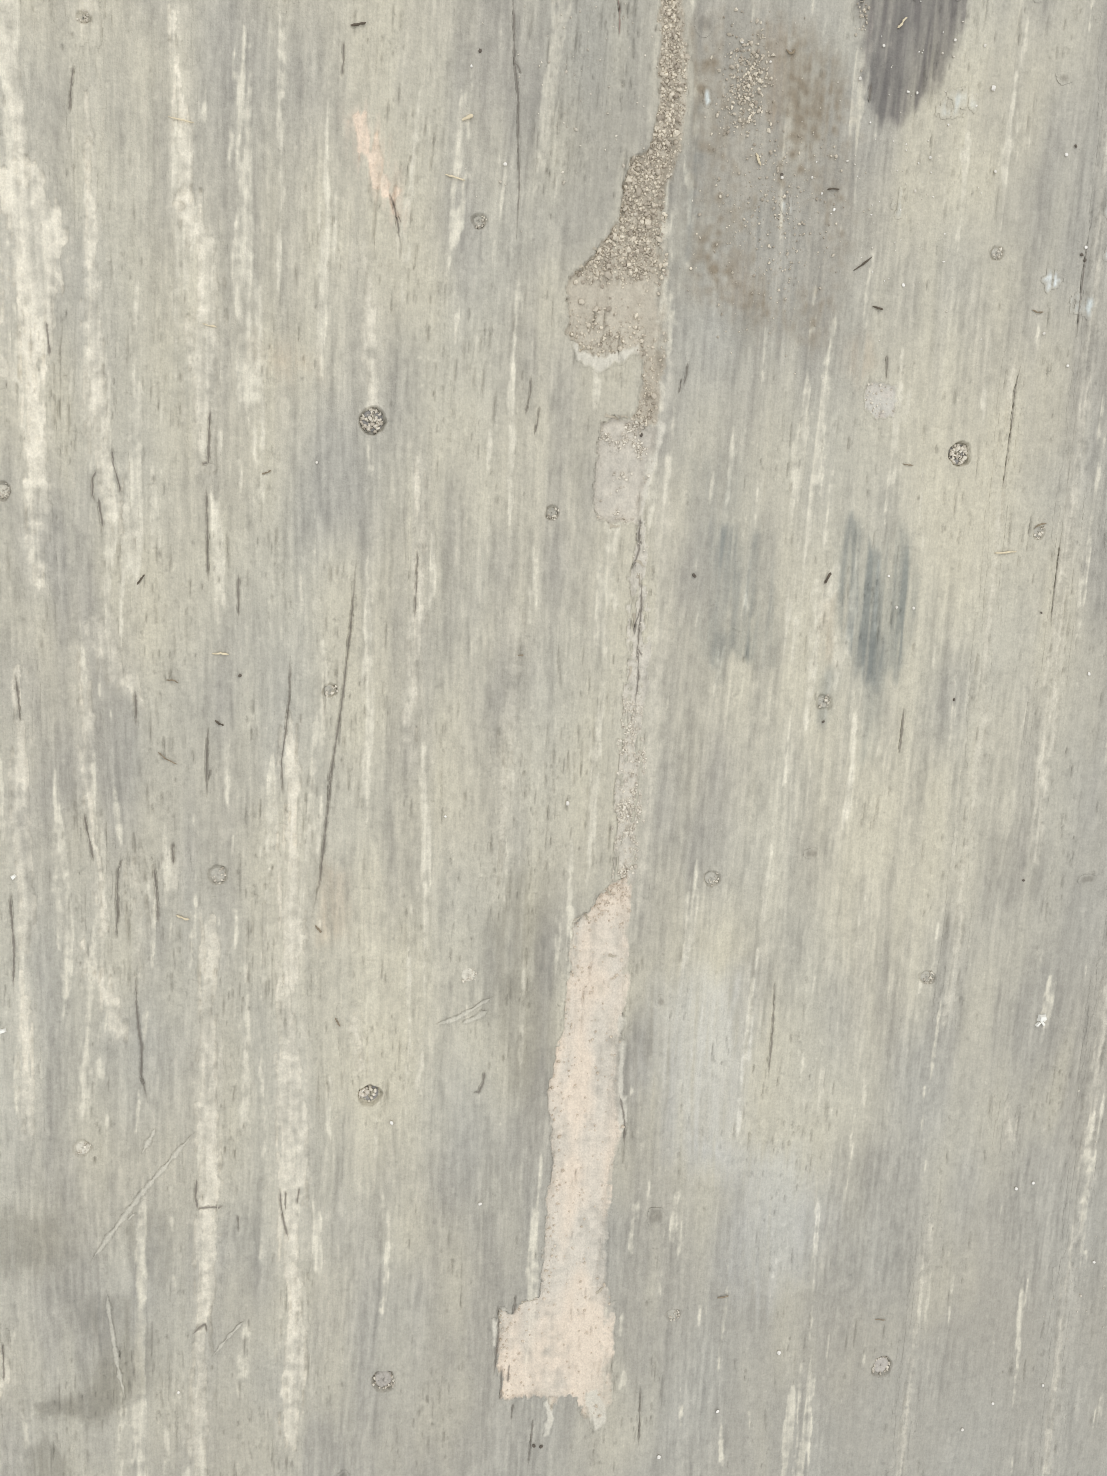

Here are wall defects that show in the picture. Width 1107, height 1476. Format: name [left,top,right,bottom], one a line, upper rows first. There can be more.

leakage [479,0,661,273]
leakage [667,0,976,369]
peeling [491,0,691,1438]